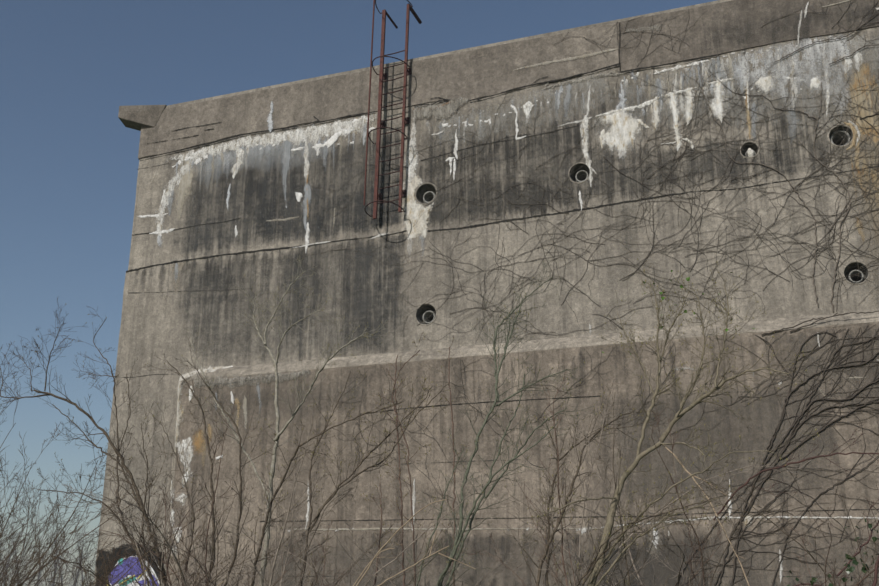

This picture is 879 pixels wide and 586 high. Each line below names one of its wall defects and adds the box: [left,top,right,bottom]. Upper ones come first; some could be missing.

damp [137,2,879,340]